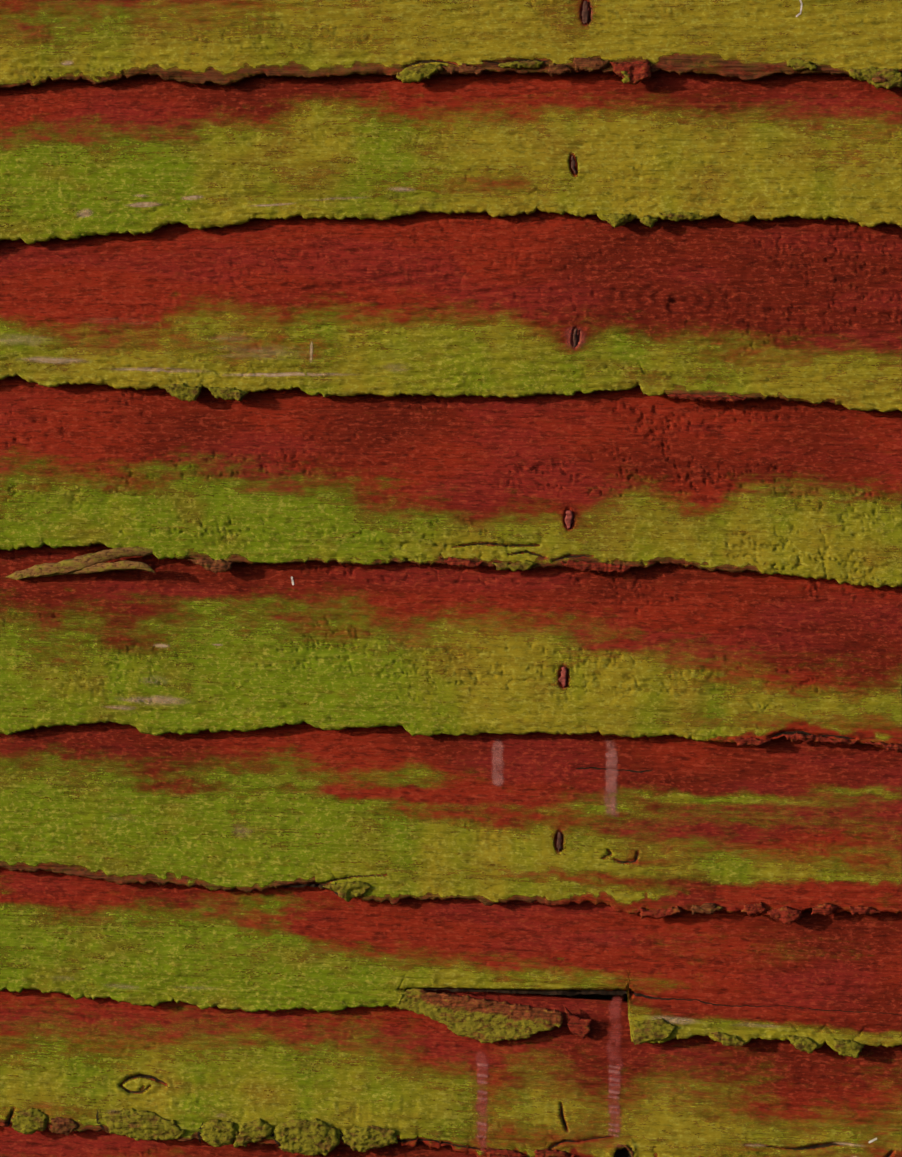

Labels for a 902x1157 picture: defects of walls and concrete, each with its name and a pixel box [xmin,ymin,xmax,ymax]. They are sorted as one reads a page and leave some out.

peeling [396,63,486,84]
peeling [499,57,651,85]
spalling [849,66,902,89]
crack [453,542,590,562]
crack [403,988,899,1015]
peeling [484,1148,575,1157]